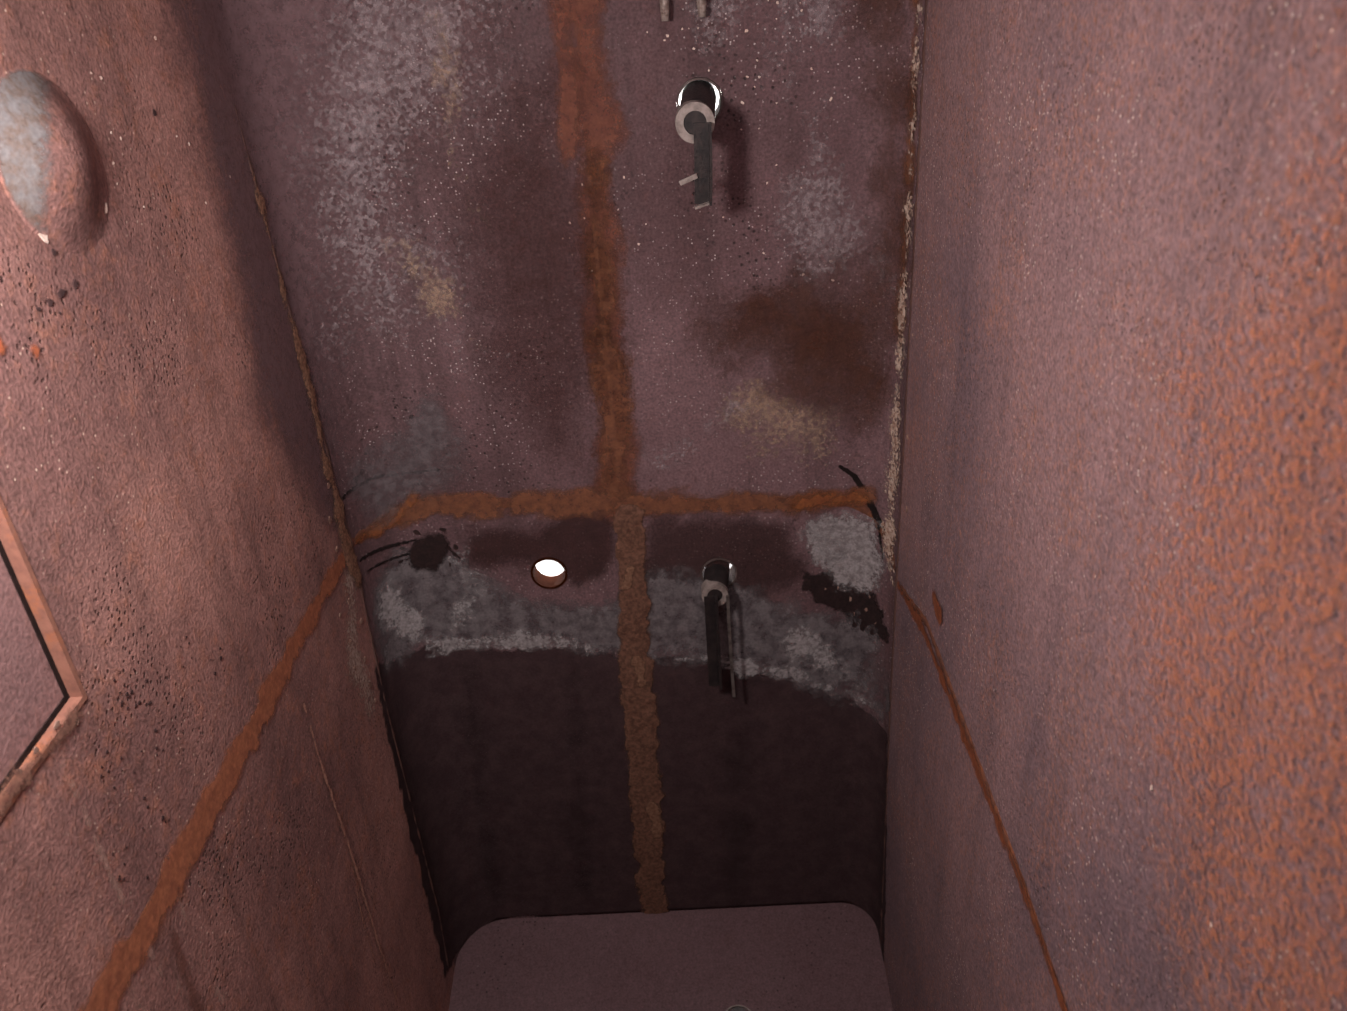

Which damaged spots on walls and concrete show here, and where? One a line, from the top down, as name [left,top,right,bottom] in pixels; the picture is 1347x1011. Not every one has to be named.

corrosion [80,552,346,1011]
corrosion [356,486,877,914]
water stain [723,380,827,452]
water stain [806,513,884,591]